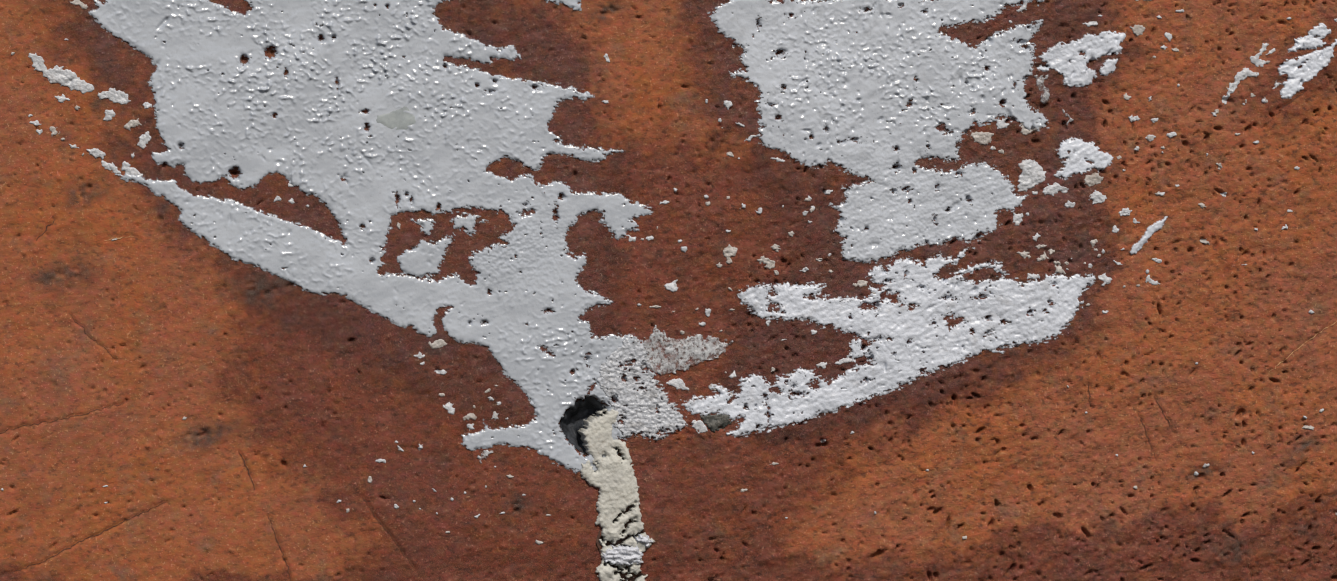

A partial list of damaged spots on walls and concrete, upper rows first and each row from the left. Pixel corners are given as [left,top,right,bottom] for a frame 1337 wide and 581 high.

leakage [56,0,371,255]
leakage [217,252,602,581]
peeling [28,0,1184,474]
leakage [369,0,1337,581]
peeling [1214,18,1337,114]